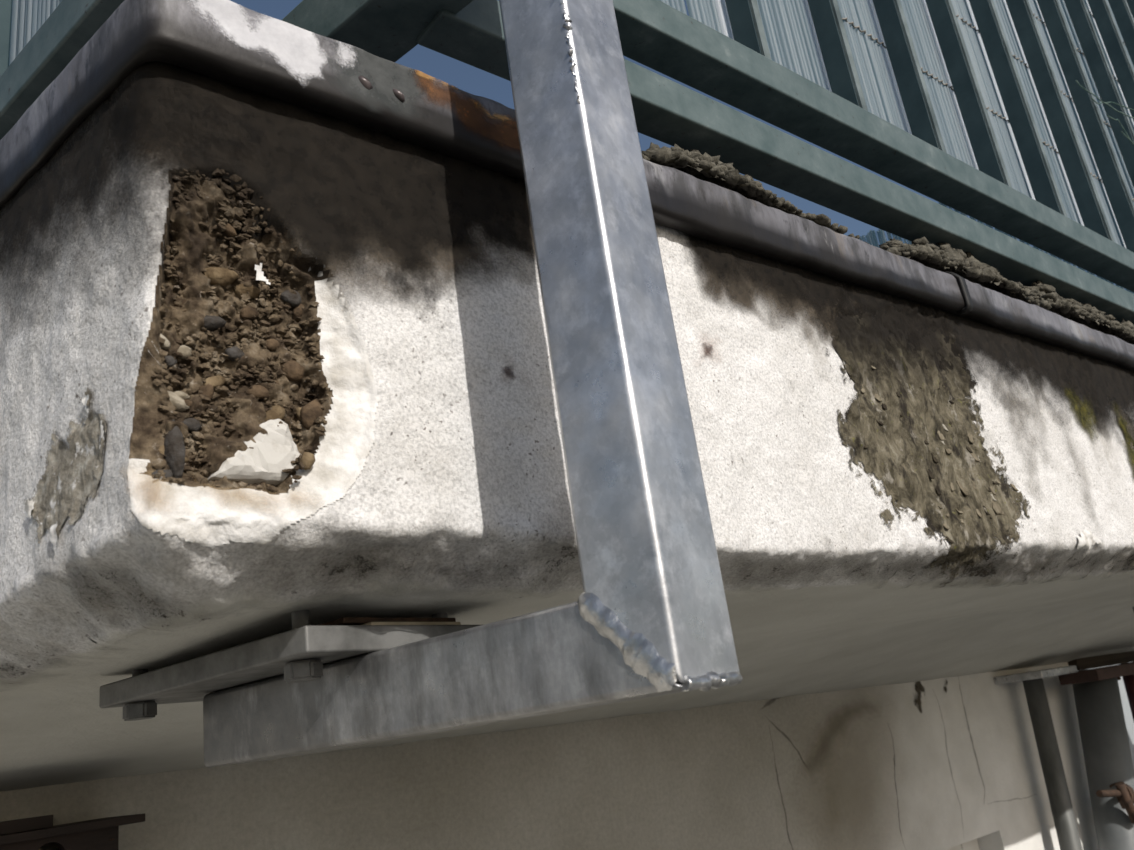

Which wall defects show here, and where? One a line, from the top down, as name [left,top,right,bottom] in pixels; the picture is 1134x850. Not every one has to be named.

damp [0,61,536,321]
rust [417,70,521,151]
peeling [24,387,107,546]
spalling [127,168,380,547]
damp [689,235,1134,477]
peeling [826,302,1031,588]